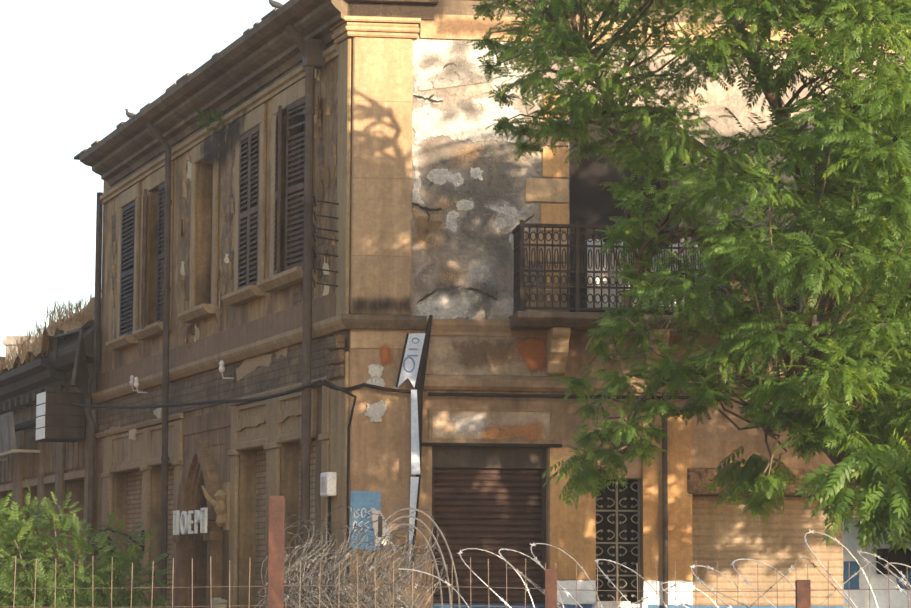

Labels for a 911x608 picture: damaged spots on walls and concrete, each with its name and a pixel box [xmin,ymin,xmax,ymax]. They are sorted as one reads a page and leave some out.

flaking render [412,35,526,245]
flaking render [215,122,235,331]
crack [417,286,497,304]
flaking render [417,284,514,319]
flaking render [365,364,387,422]